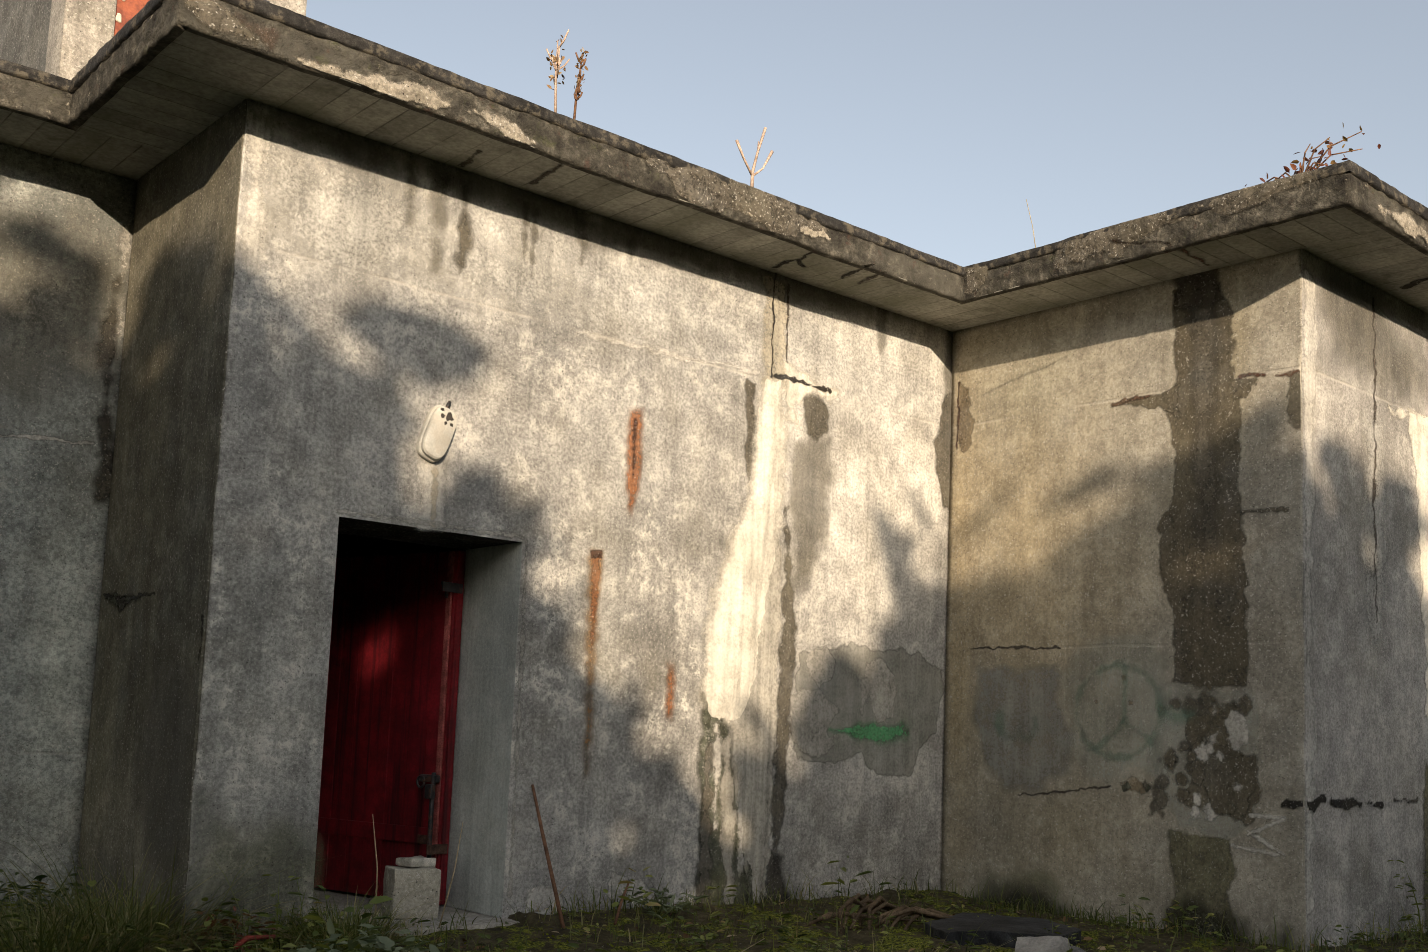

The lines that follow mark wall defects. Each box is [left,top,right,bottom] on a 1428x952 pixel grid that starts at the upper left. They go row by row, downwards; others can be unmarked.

crack [770,252,832,394]
crack [841,264,886,284]
damp [244,111,900,906]
corrosion [626,410,643,509]
damp [1111,269,1428,915]
corrosion [584,550,602,772]
corrosion [665,669,675,718]
peeling [1019,691,1263,826]
crack [1281,794,1418,813]
damp [1166,830,1245,942]